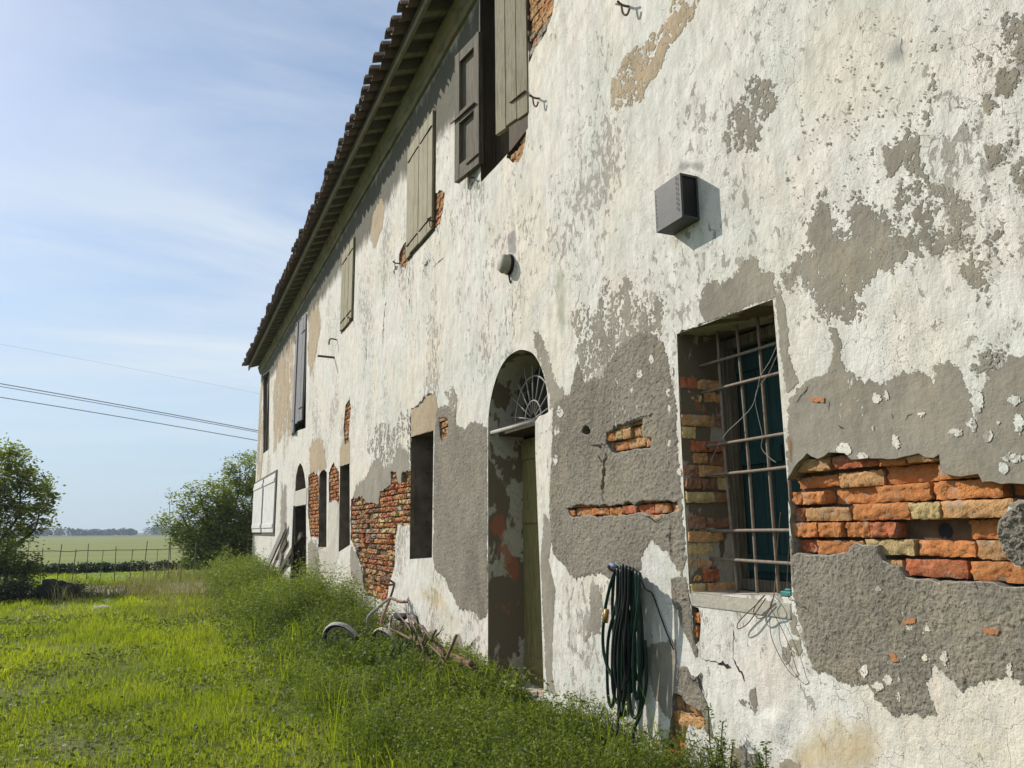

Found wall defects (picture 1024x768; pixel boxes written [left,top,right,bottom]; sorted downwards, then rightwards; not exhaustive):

peeling [610,0,699,110]
peeling [306,386,488,620]
peeling [533,277,713,766]
peeling [699,8,1024,719]